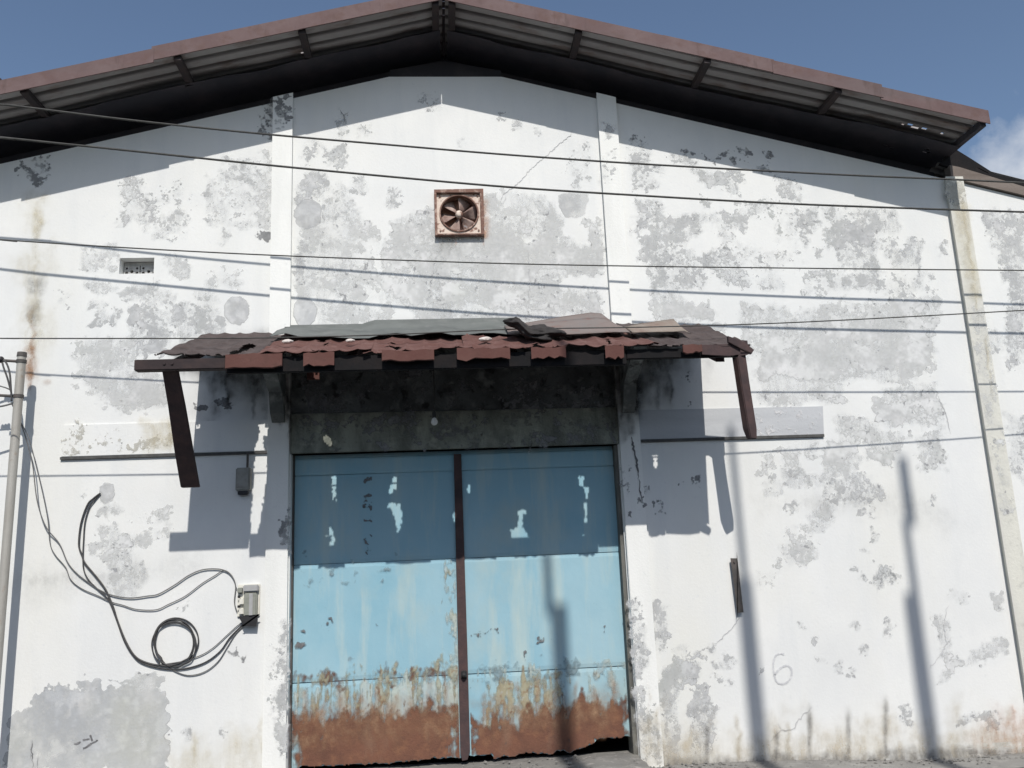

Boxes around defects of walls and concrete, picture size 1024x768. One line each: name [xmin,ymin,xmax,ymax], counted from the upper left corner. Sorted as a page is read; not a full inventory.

peeling [118,176,190,242]
peeling [292,113,606,324]
peeling [71,265,243,414]
peeling [630,135,945,578]
crack [631,437,643,502]
peeling [88,505,173,594]
peeling [850,560,897,584]
peeling [3,672,171,768]
rust [292,561,629,768]
peeling [626,598,733,764]